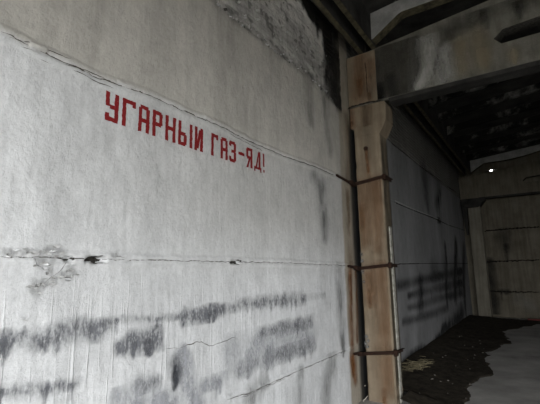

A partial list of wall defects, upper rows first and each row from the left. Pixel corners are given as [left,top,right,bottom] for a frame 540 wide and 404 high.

crack [40,50,334,175]
flaking render [4,244,79,294]
crack [5,256,84,280]
crack [103,255,229,263]
water stain [178,297,288,326]
water stain [0,331,26,354]
water stain [33,320,106,350]
water stain [115,318,163,357]
water stain [173,346,221,404]
crack [228,350,346,400]